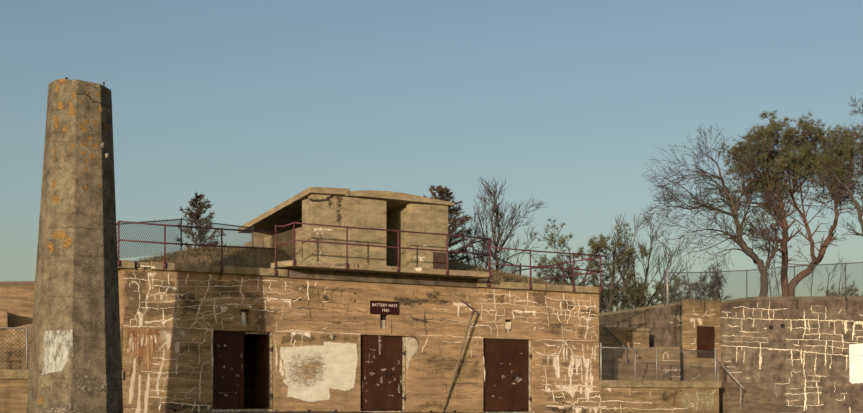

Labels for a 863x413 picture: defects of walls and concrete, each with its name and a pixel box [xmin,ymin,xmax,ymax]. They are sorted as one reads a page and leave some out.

rust [125,327,159,371]
leakage [124,270,212,413]
leakage [212,281,291,330]
leakage [282,331,356,343]
leakage [564,302,596,340]
leakage [538,346,616,413]